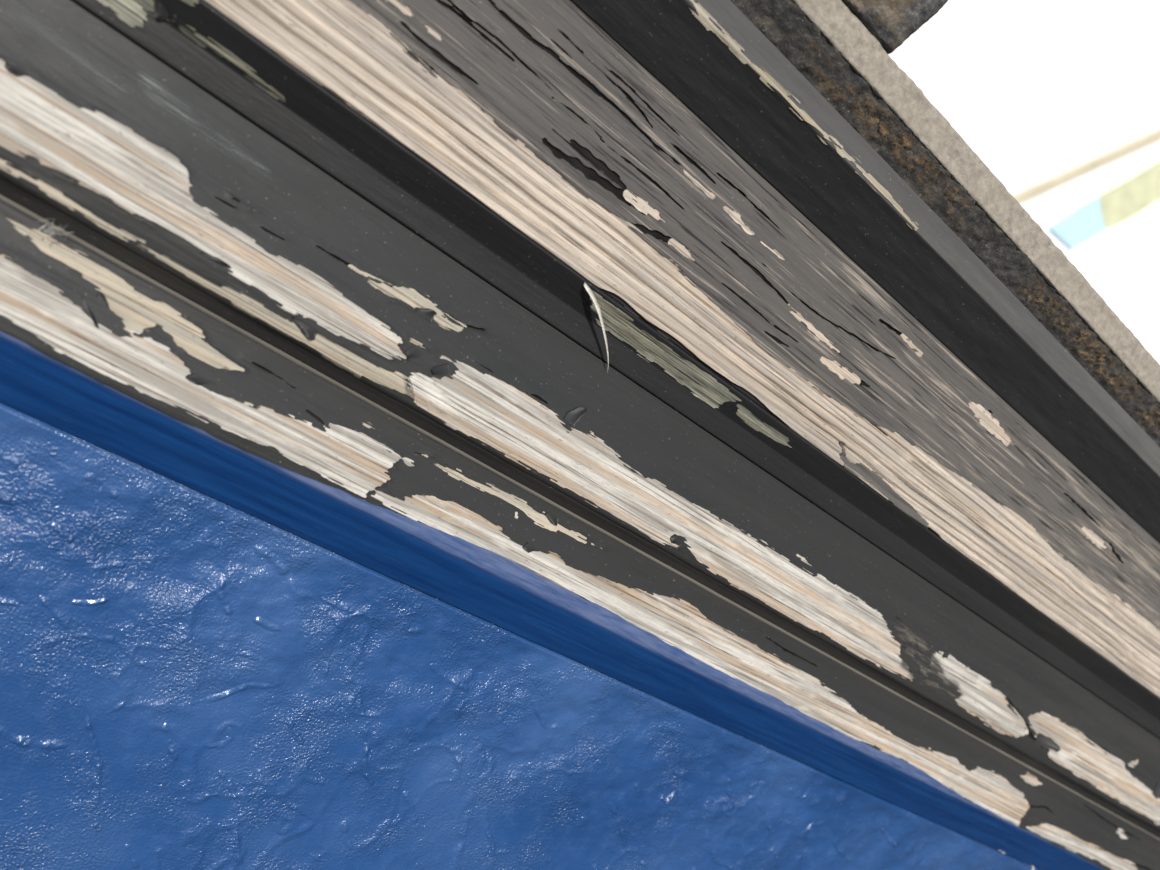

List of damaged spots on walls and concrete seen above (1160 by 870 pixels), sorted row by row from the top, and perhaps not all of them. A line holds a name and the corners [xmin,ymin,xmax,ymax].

peeling [98,0,286,102]
peeling [0,217,1160,870]
peeling [182,0,1160,698]